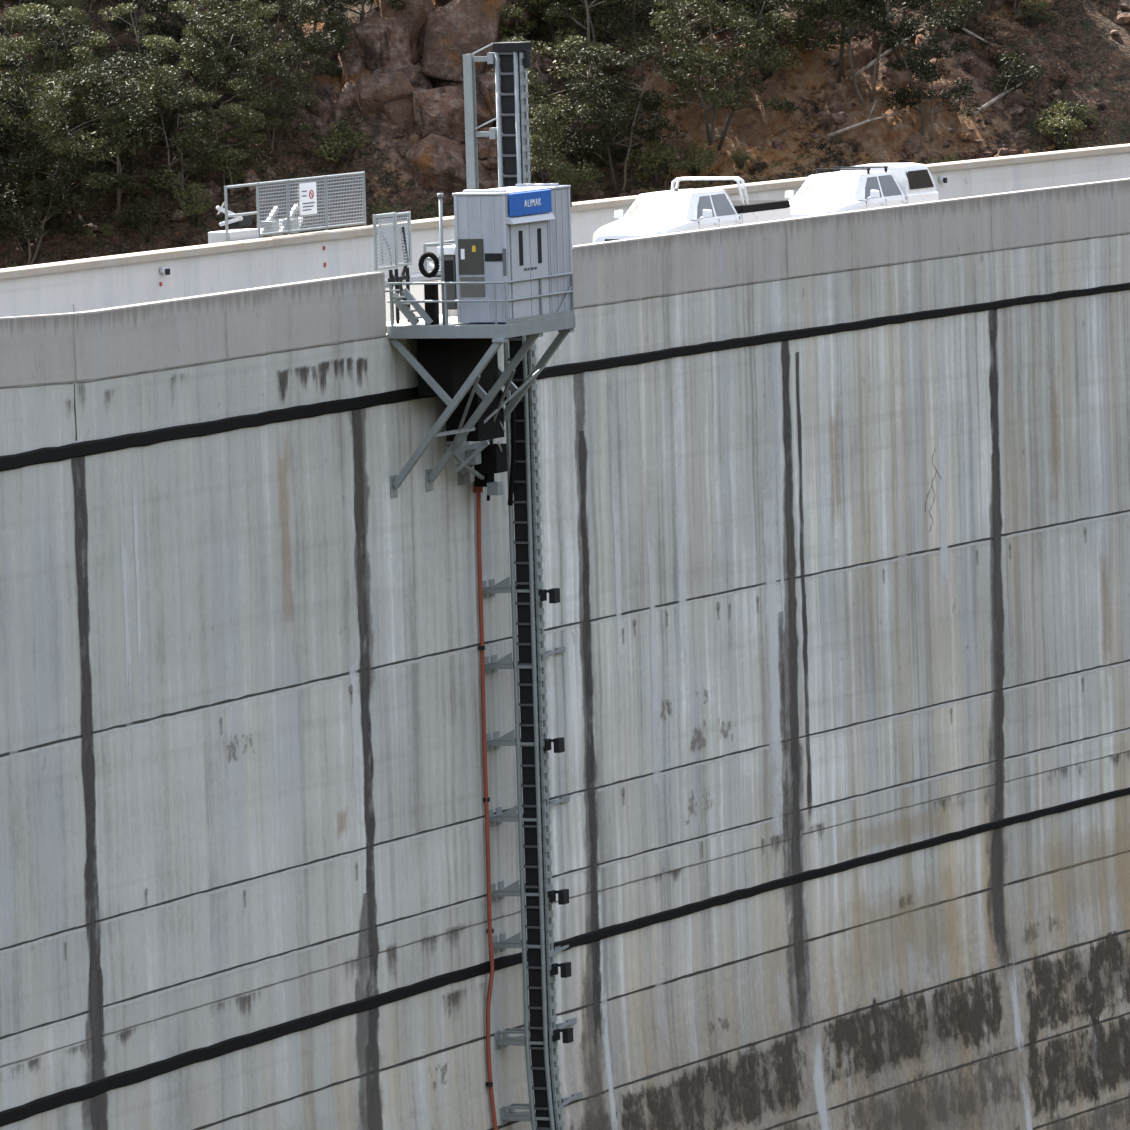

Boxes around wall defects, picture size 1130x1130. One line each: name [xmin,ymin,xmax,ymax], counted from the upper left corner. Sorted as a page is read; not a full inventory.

damp [72,456,108,1130]
damp [279,358,367,400]
damp [347,408,396,1130]
crack [0,448,1130,761]
damp [764,340,824,1022]
efflorescence [814,1046,828,1130]
damp [987,309,1007,960]
damp [1012,977,1021,1044]